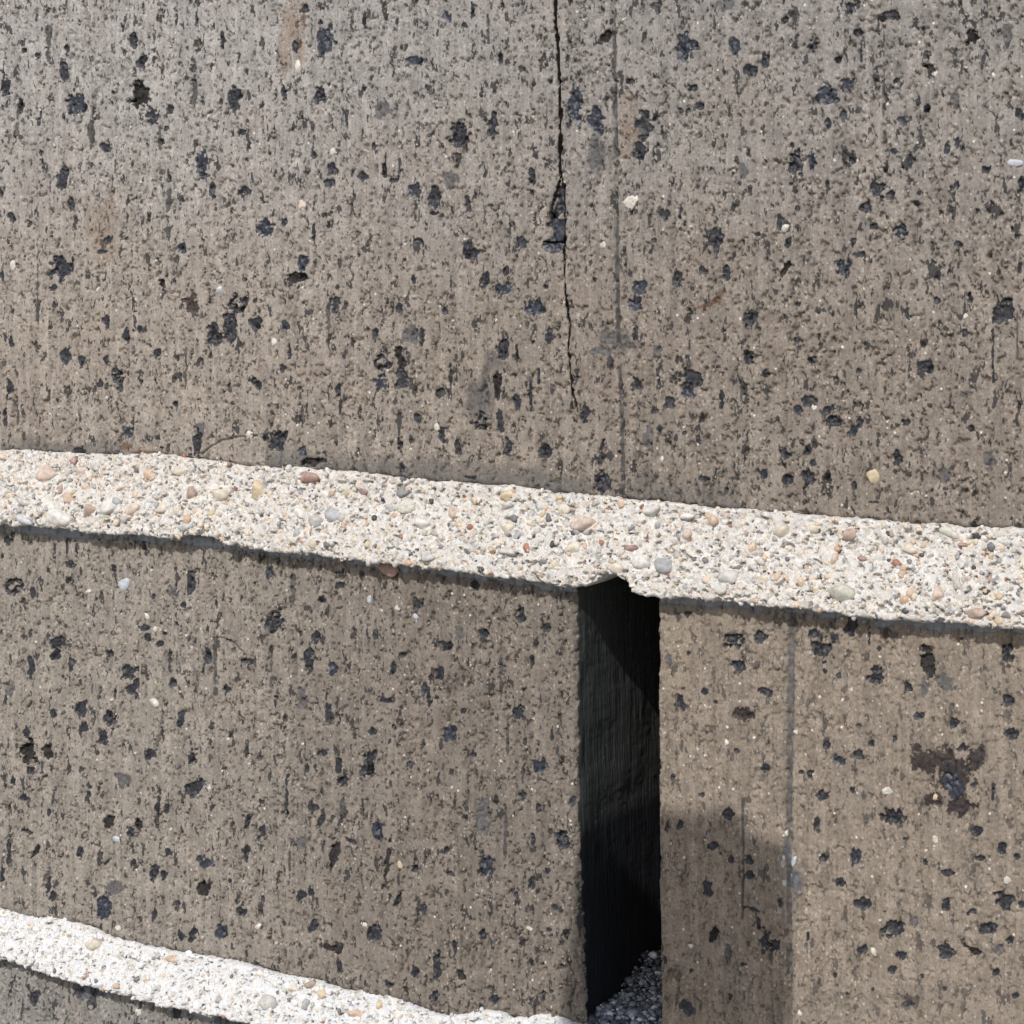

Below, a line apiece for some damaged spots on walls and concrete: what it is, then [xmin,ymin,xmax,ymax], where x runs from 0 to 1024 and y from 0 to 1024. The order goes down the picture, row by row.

crack [543,0,580,417]